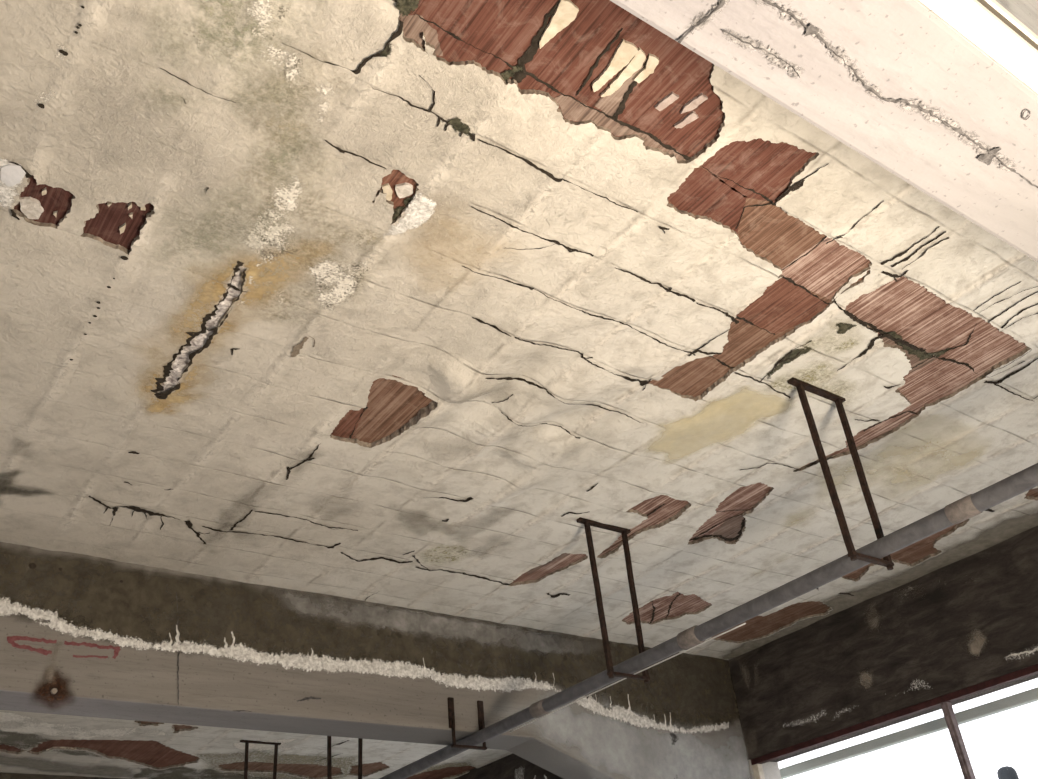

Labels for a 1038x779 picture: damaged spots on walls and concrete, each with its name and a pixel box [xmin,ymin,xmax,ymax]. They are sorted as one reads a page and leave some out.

spalling [0,159,74,225]
spalling [83,201,154,260]
spalling [395,0,871,397]
crack [772,163,829,205]
crack [826,201,884,244]
corrosion [174,253,302,338]
corrosion [144,366,199,413]
spalling [331,375,433,443]
leakage [650,365,825,458]
spalling [800,276,1027,468]
crack [89,482,510,585]
crack [546,591,571,599]